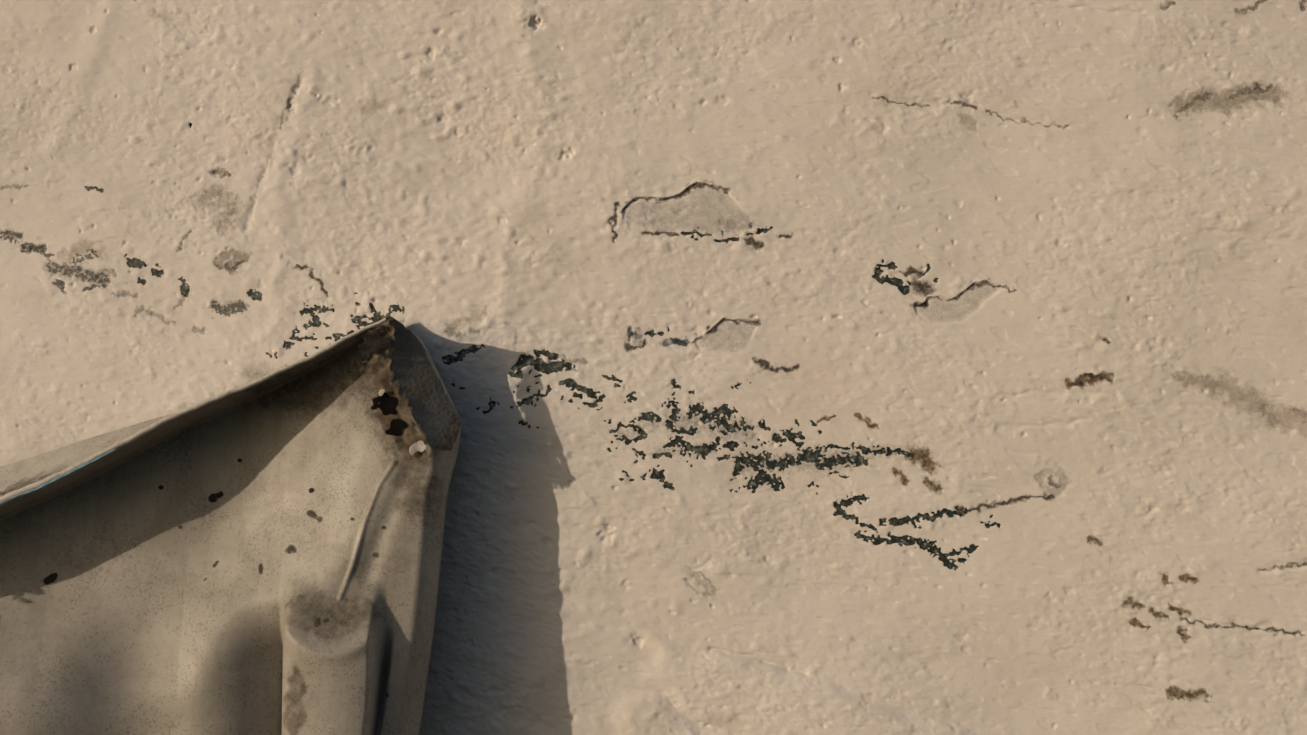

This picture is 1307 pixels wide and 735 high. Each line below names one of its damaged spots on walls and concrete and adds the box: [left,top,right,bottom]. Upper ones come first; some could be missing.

flaking render [202,169,237,222]
peeling [0,231,190,297]
flaking render [215,249,249,274]
peeling [208,289,262,319]
peeling [266,264,405,366]
peeling [624,313,761,351]
peeling [476,349,914,495]
peeling [833,494,1042,570]